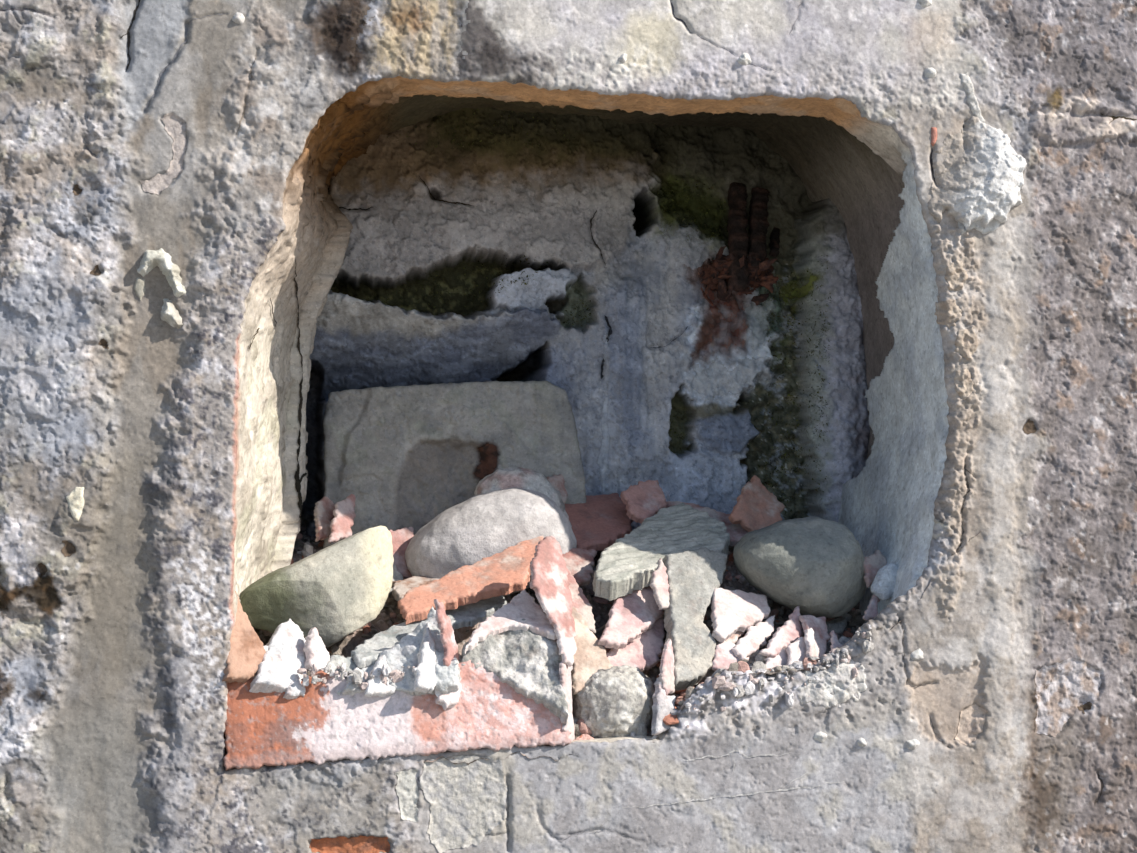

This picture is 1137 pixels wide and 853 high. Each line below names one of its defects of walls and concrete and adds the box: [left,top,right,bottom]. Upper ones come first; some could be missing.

crack [121,0,140,72]
crack [144,13,229,113]
crack [671,2,779,73]
corrosion [686,246,779,361]
crack [248,260,307,535]
peeling [314,494,356,543]
peeling [863,550,887,621]
peeling [711,606,843,671]